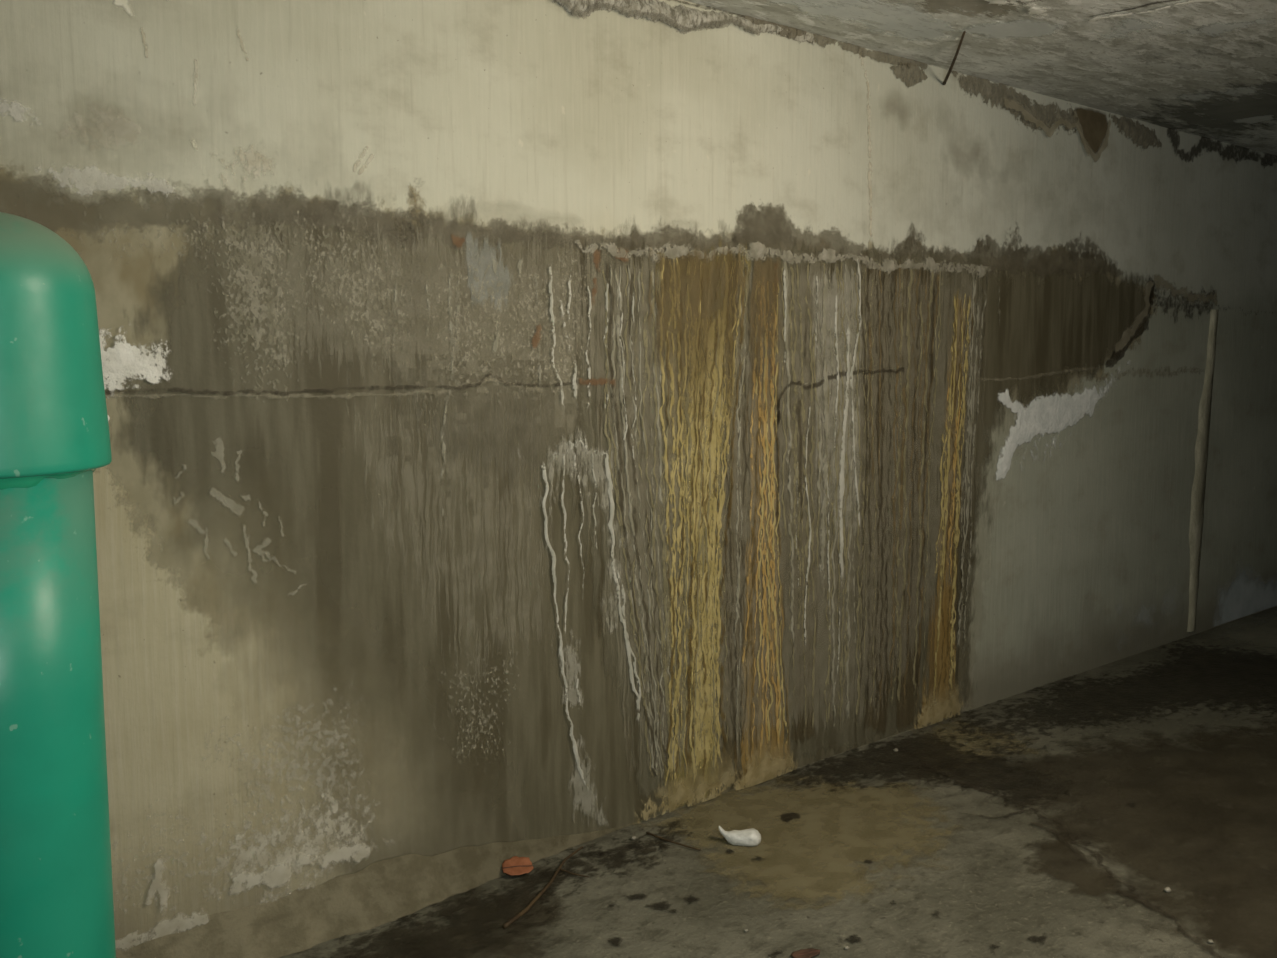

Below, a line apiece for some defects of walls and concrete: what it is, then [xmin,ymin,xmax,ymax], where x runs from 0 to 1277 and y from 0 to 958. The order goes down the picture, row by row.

peeling [921,0,1053,19]
spalling [552,0,928,236]
spalling [951,71,1091,155]
spalling [1109,114,1277,168]
crack [152,373,575,398]
damp [0,168,1146,958]
rust [637,243,797,824]
rust [914,294,975,730]
damp [1220,574,1277,624]
damp [932,642,1277,764]
damp [1005,722,1277,958]